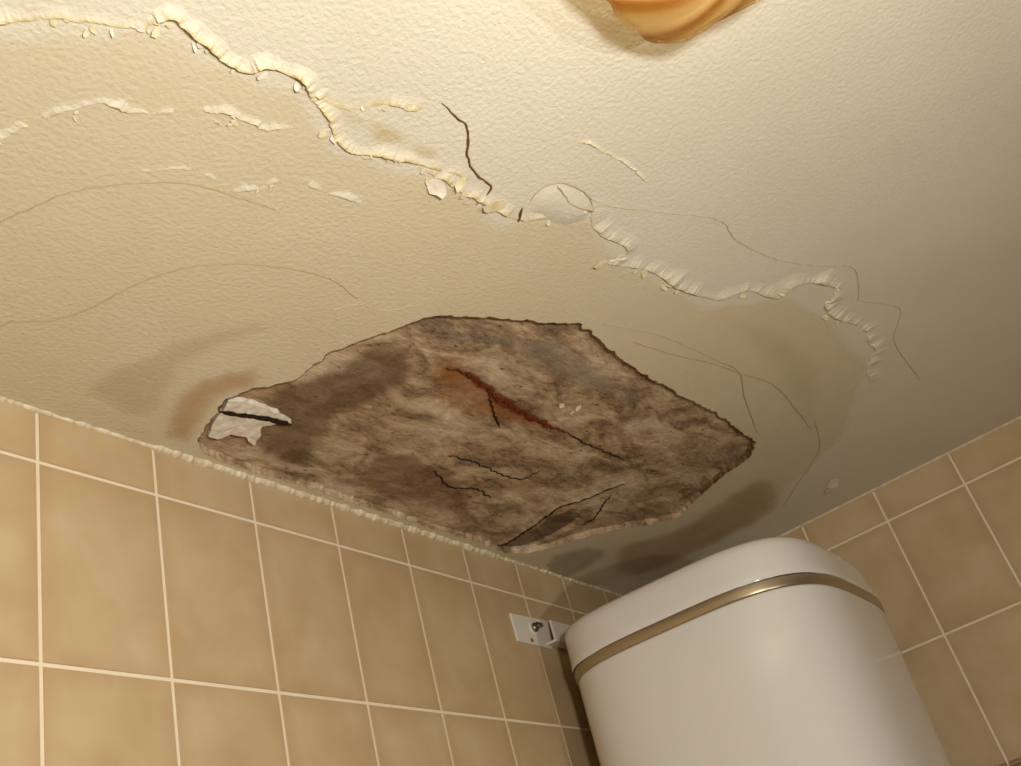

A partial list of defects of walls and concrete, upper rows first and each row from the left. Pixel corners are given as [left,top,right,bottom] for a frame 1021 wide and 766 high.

crack [0,181,276,222]
peeling [0,3,551,226]
crack [442,103,492,205]
crack [0,263,421,328]
peeling [583,195,889,387]
leakage [269,357,404,457]
spalling [198,315,757,555]
crack [432,456,539,499]
corrosion [443,367,566,433]
crack [498,484,623,547]
crack [567,432,624,460]
crack [604,323,820,507]